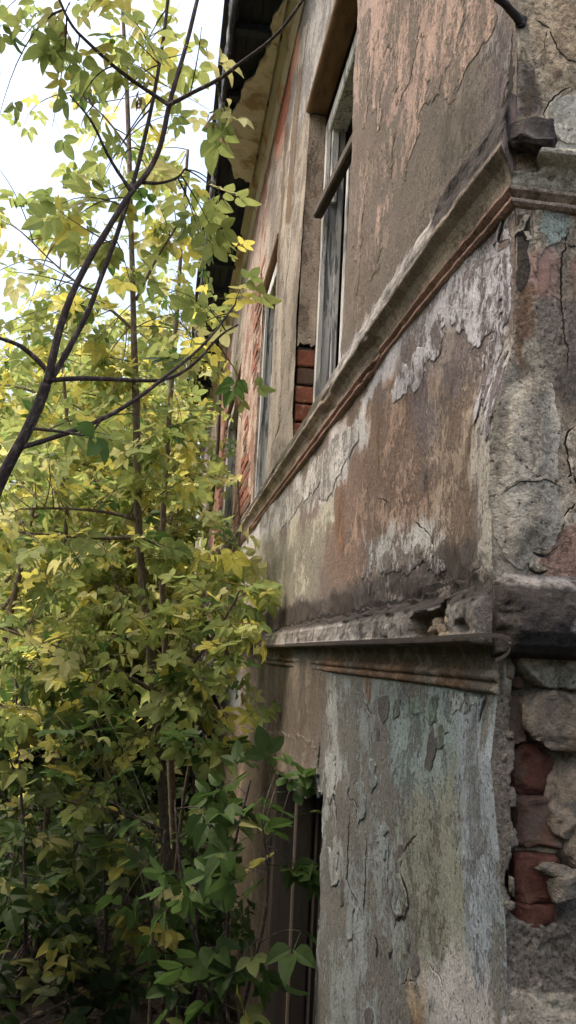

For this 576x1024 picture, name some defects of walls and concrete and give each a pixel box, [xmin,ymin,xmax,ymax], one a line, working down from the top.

peeling [356,0,498,188]
crack [500,16,576,119]
peeling [352,158,384,295]
peeling [391,209,567,441]
crack [560,214,576,401]
crack [500,426,576,530]
damp [260,601,317,626]
flaking render [427,616,449,636]
peeling [376,689,484,771]
flaking render [501,660,576,928]
peeling [327,846,355,941]
peeling [376,822,406,917]